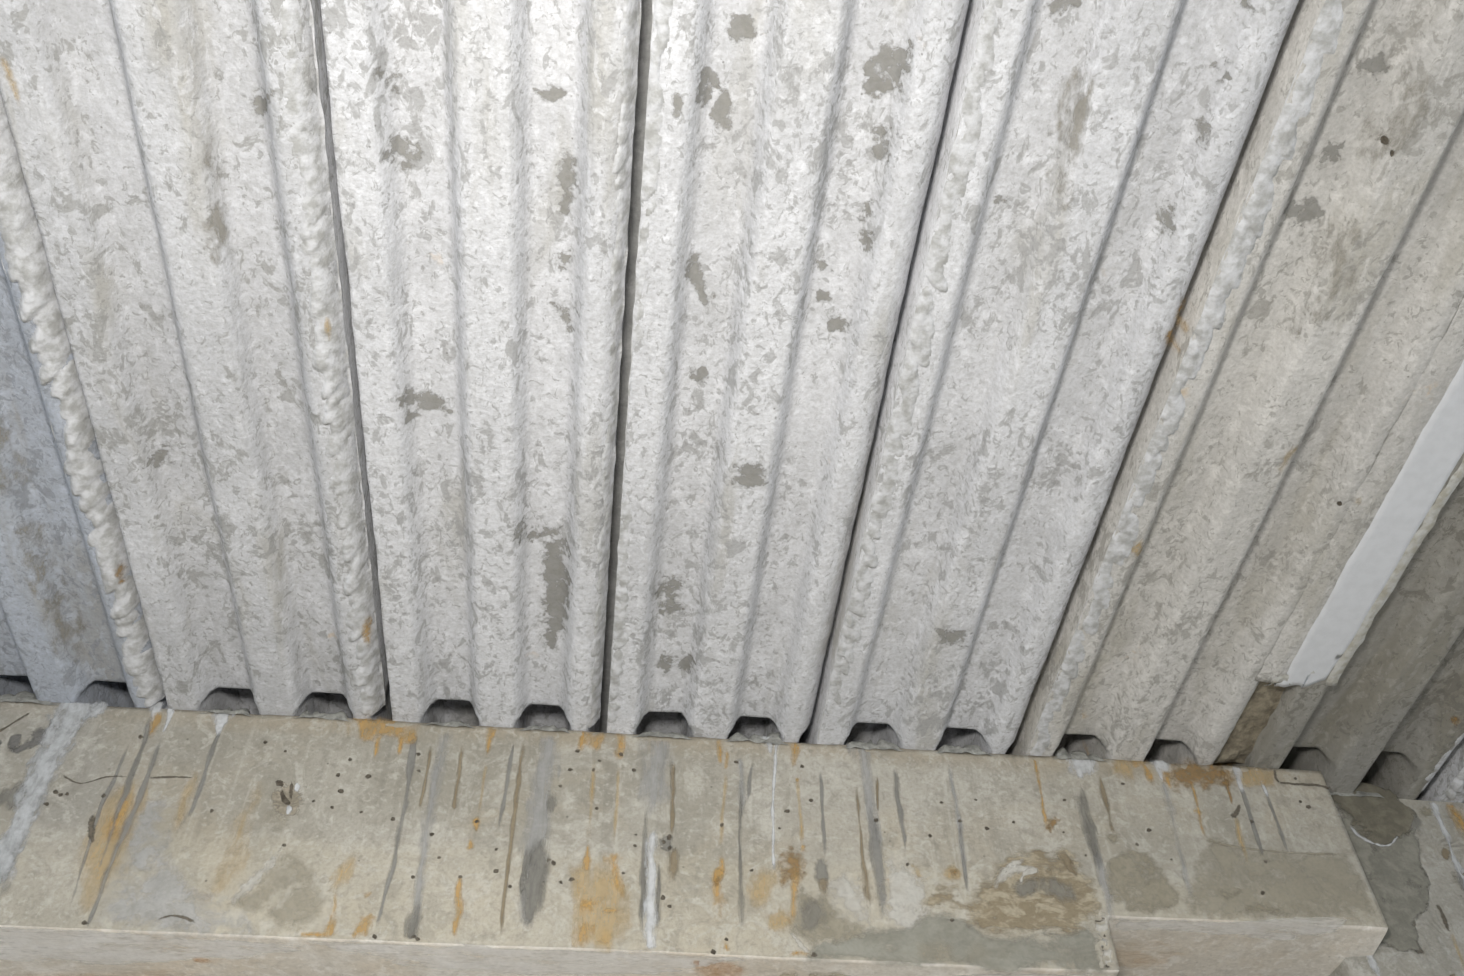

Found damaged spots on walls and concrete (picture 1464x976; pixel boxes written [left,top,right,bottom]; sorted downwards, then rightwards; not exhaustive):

water stain [0,702,107,880]
water stain [500,739,556,927]
water stain [640,742,675,948]
rust [1121,762,1266,848]